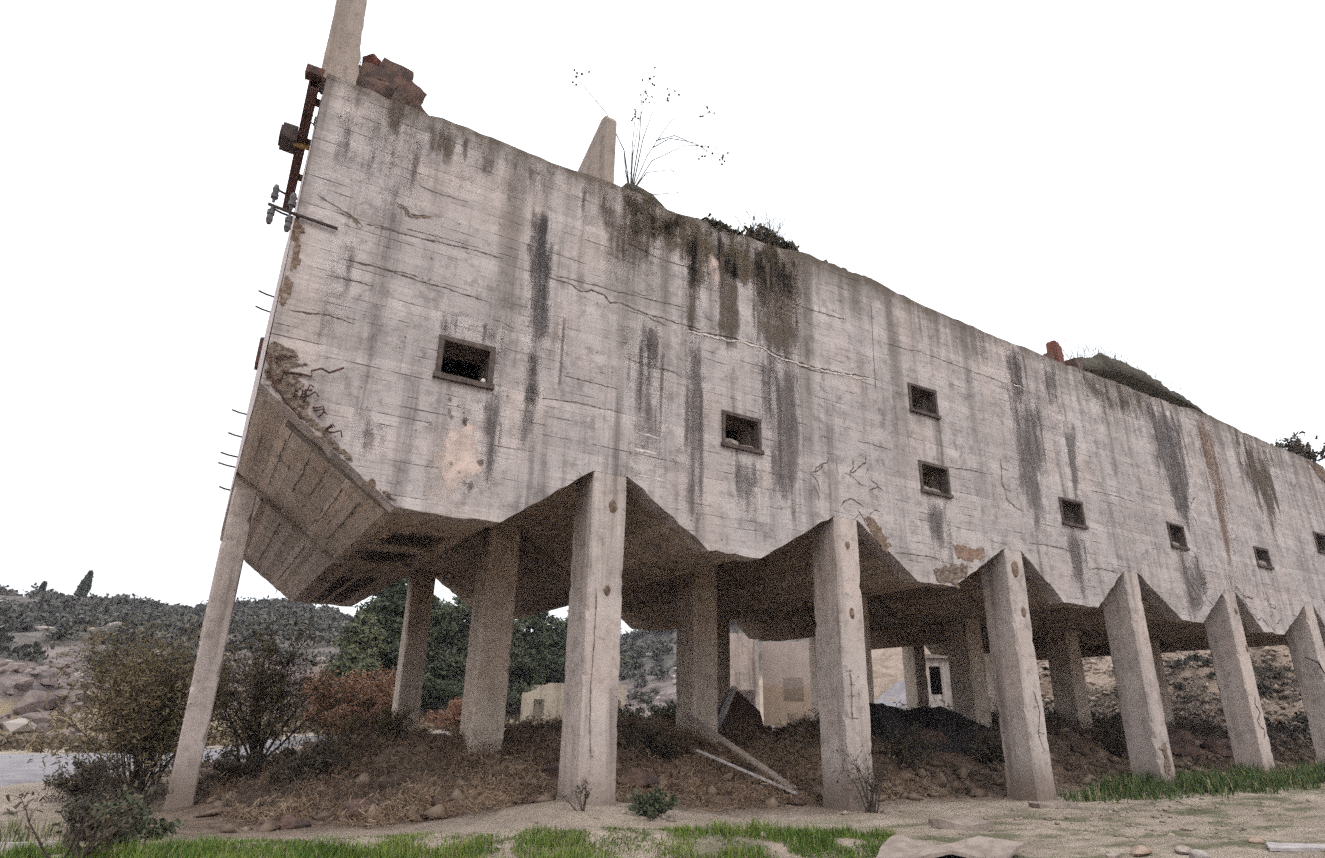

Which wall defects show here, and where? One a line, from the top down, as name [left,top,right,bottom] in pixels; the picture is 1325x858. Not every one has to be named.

damp [524,216,552,433]
crack [549,275,1025,389]
spalling [264,341,353,462]
spalling [365,478,397,501]
damp [1147,401,1189,526]
damp [1235,431,1280,531]